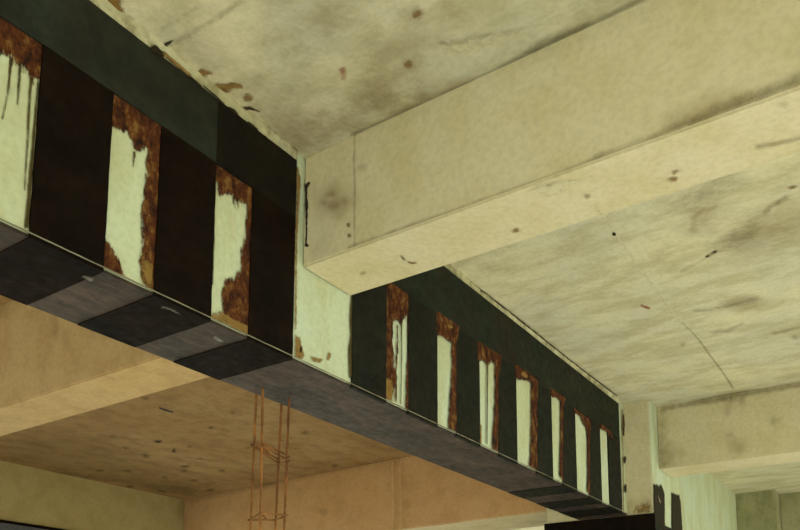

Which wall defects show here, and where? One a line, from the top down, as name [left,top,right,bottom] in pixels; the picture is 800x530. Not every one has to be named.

corrosion [0,17,42,228]
corrosion [112,94,161,289]
corrosion [104,239,124,276]
corrosion [211,165,252,334]
corrosion [295,336,331,363]
corrosion [386,283,409,409]
corrosion [437,311,460,432]
corrosion [478,341,502,451]
corrosion [515,365,538,470]
corrosion [550,387,565,480]
corrosion [574,408,612,494]